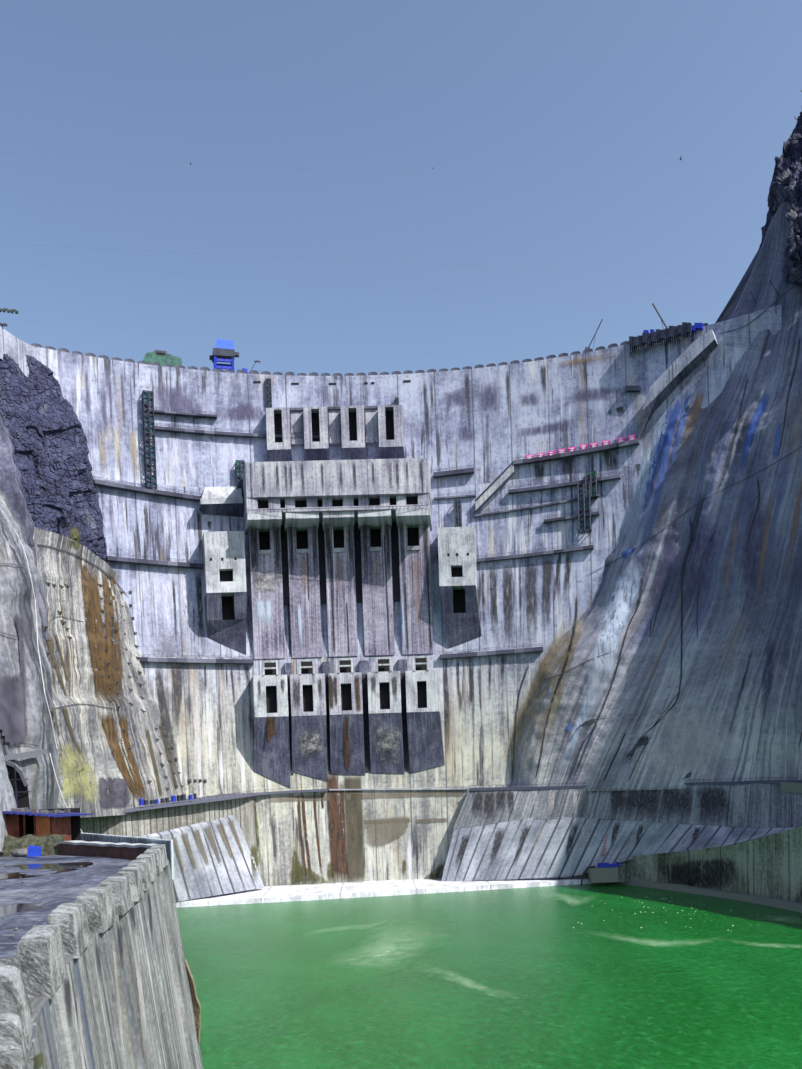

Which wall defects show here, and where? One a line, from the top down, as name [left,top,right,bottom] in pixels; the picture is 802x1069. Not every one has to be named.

leakage [424,386,433,431]
leakage [485,367,546,407]
leakage [522,423,568,434]
leakage [579,361,607,399]
leakage [591,450,618,511]
leakage [482,554,571,624]
leakage [595,573,639,673]
leakage [281,680,300,704]
leakage [566,699,593,755]
corrosion [327,675,361,878]
leakage [173,804,262,871]
leakage [118,908,136,956]